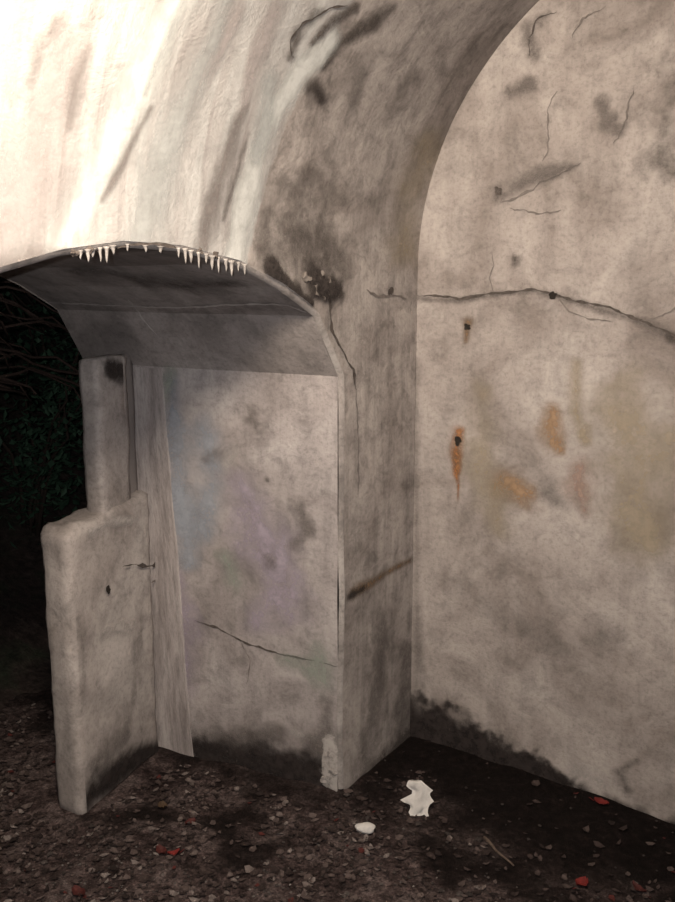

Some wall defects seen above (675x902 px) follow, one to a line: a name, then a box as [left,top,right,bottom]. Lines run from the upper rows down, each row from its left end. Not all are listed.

water stain [48,0,195,257]
water stain [1,251,39,267]
crack [367,255,675,342]
crack [329,302,360,489]
corrosion [452,428,464,493]
corrosion [348,559,411,599]
crack [195,620,337,682]
water stain [362,644,588,792]